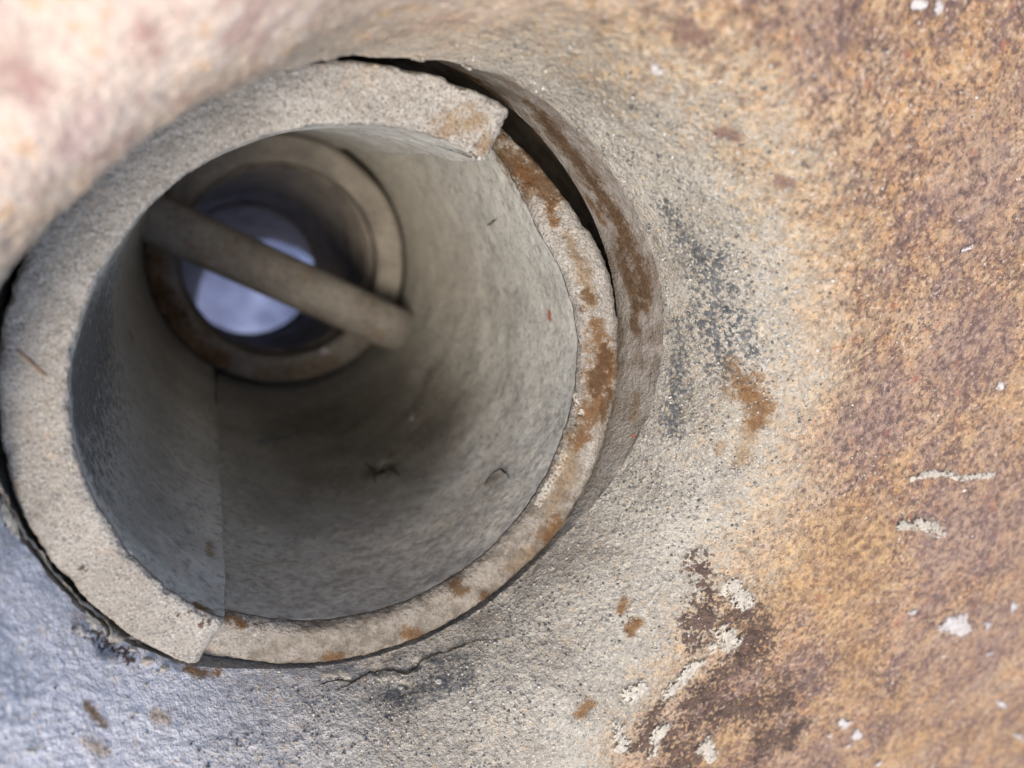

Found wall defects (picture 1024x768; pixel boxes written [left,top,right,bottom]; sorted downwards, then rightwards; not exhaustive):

corrosion [497,135,561,204]
corrosion [529,104,651,333]
crack [314,639,495,710]